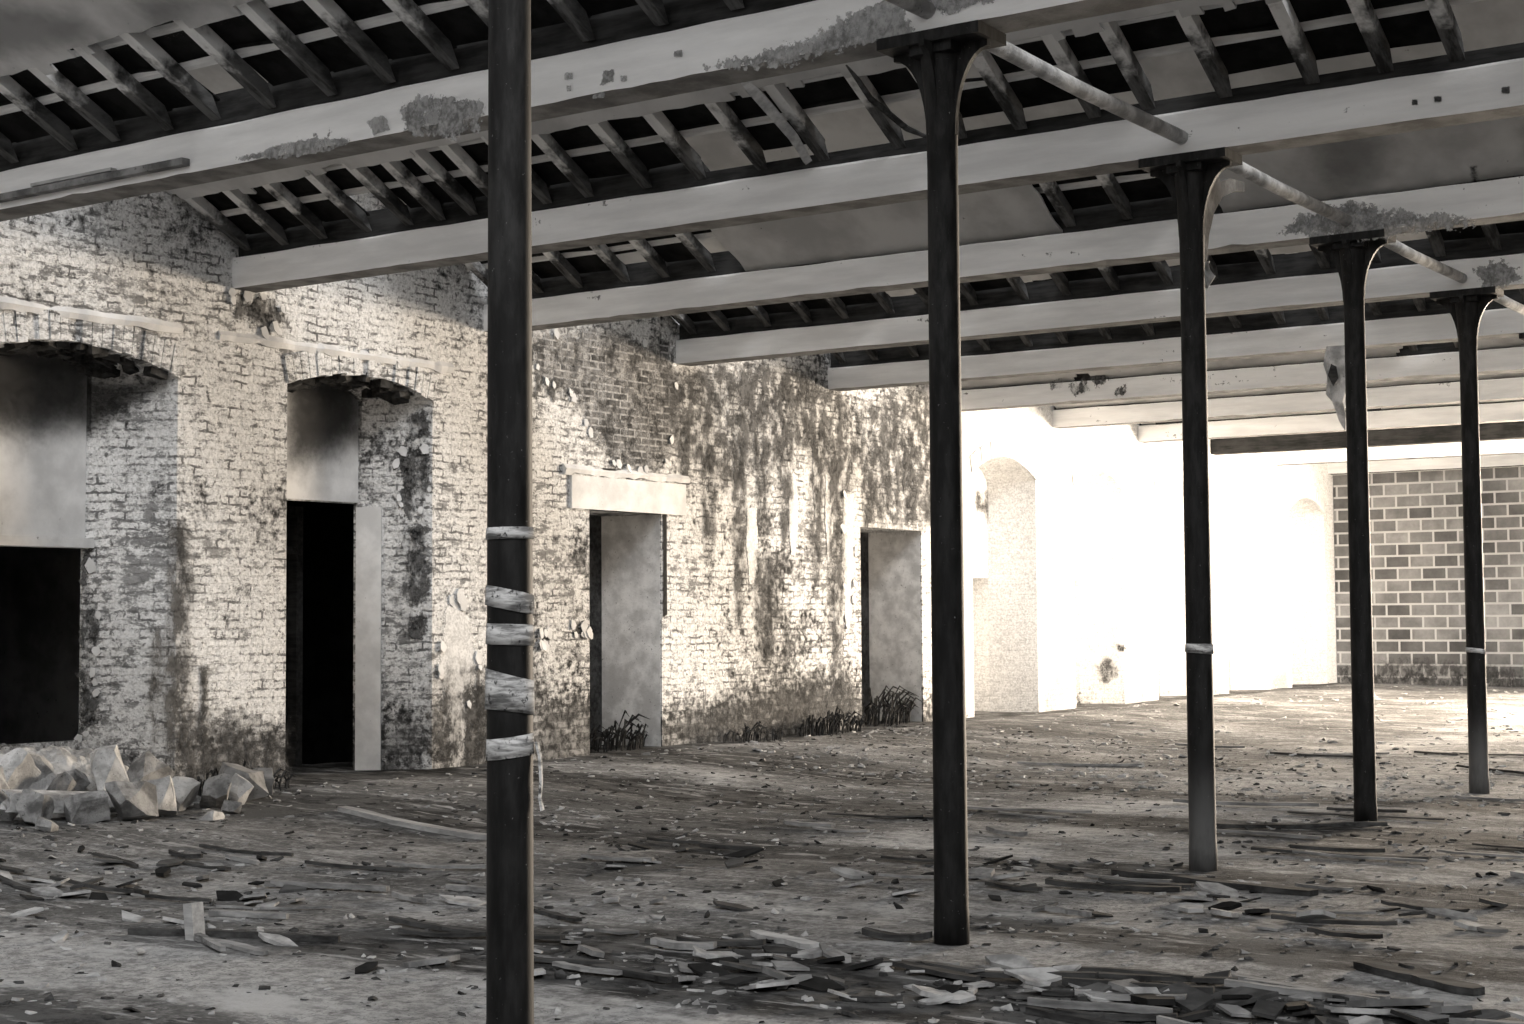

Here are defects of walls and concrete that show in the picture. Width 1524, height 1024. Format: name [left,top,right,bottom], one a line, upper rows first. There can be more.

flaking render [228,287,288,339]
spalling [74,548,103,743]
peeling [287,373,486,767]